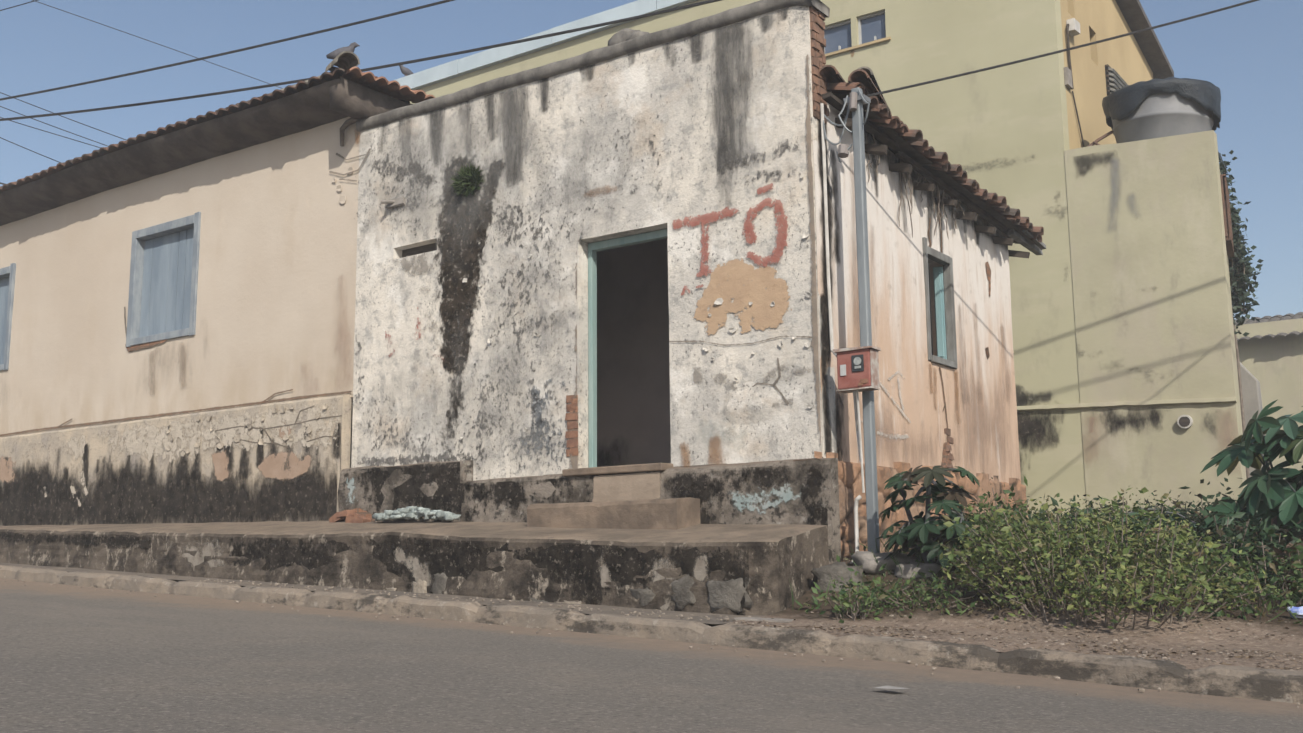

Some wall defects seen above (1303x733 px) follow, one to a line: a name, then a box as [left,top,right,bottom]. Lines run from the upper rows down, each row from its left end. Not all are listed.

leakage [409,100,469,188]
leakage [474,86,525,252]
leakage [540,78,548,112]
leakage [689,22,749,169]
peeling [693,54,822,457]
spalling [125,339,167,352]
peeling [356,180,614,470]
peeling [67,402,340,507]
spalling [329,478,375,523]
leakage [0,423,749,616]
peeling [592,472,661,502]
leakage [1016,386,1063,467]